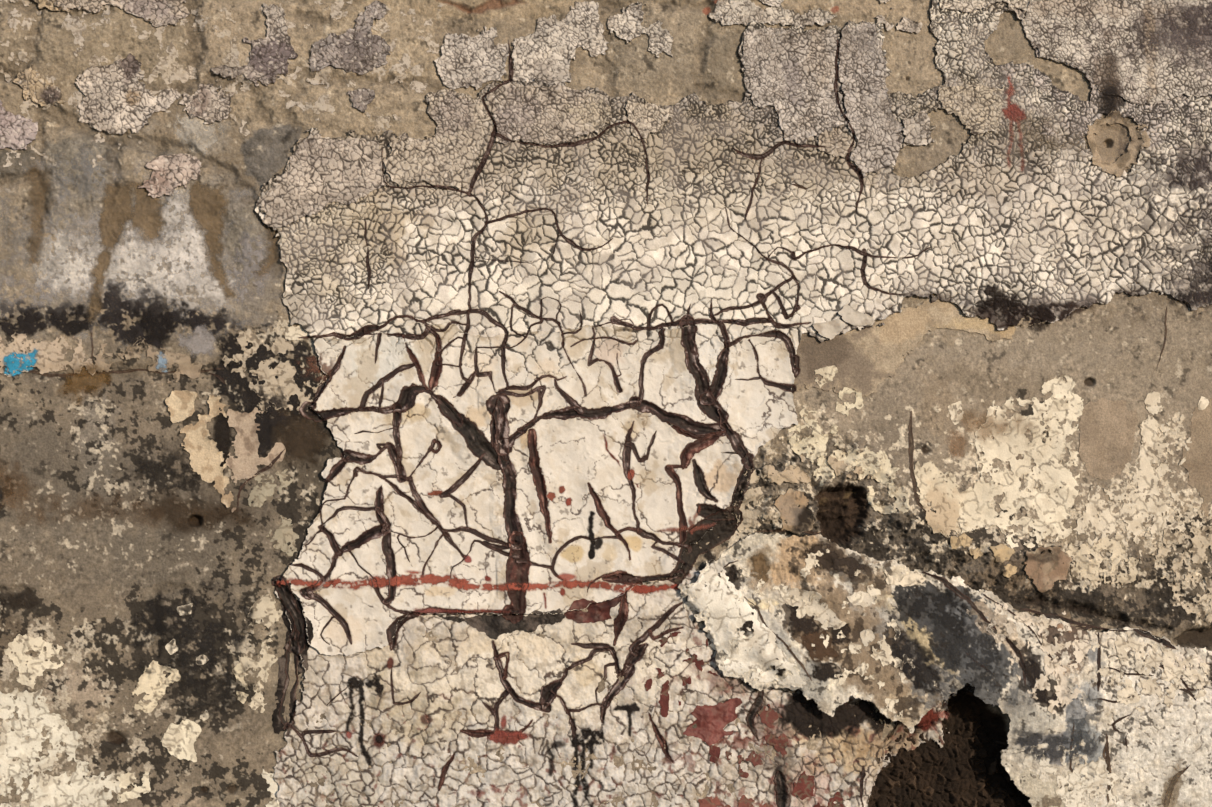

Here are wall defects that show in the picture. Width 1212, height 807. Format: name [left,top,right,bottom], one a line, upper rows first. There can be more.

peeling [0,0,673,175]
peeling [138,153,202,198]
crack [237,449,285,512]
peeling [0,295,1212,807]
crack [255,0,1212,807]